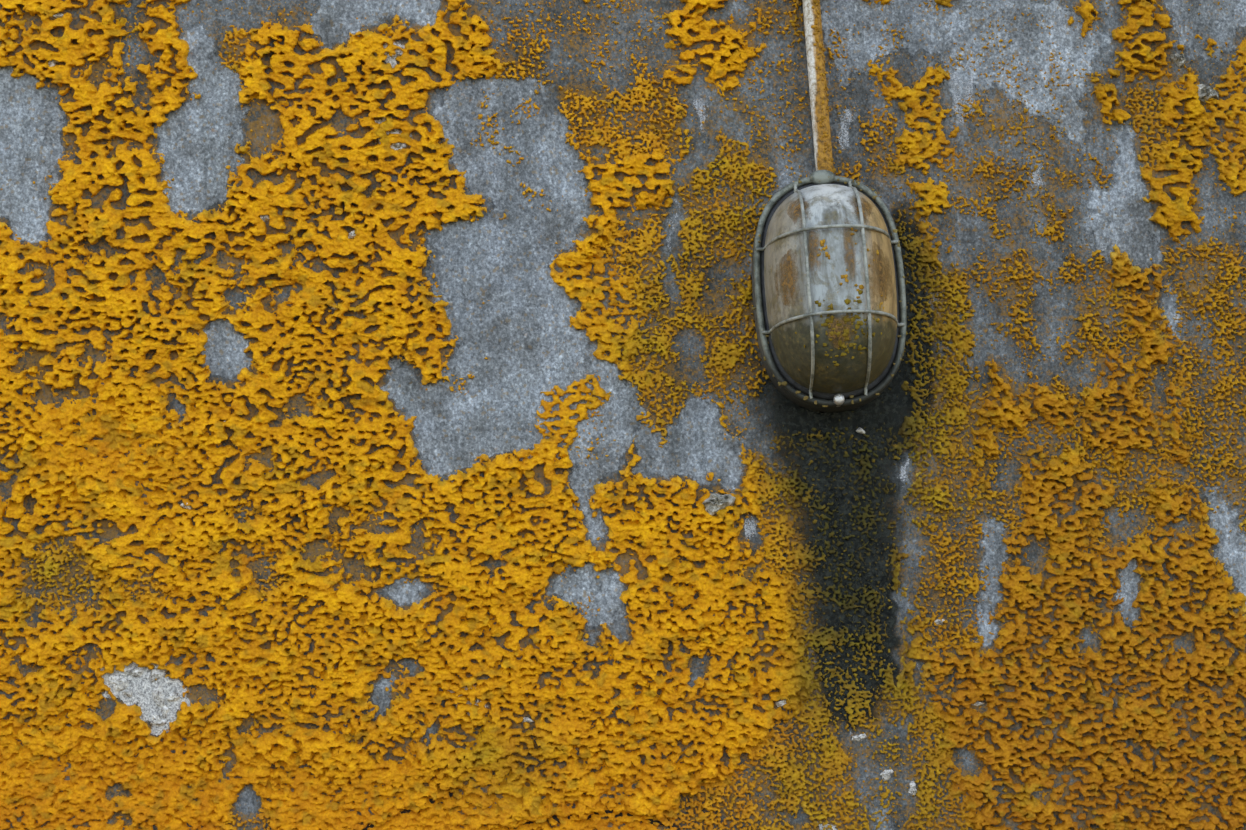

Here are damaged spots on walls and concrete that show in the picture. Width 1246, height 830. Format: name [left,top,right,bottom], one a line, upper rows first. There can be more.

leakage [756,209,933,728]